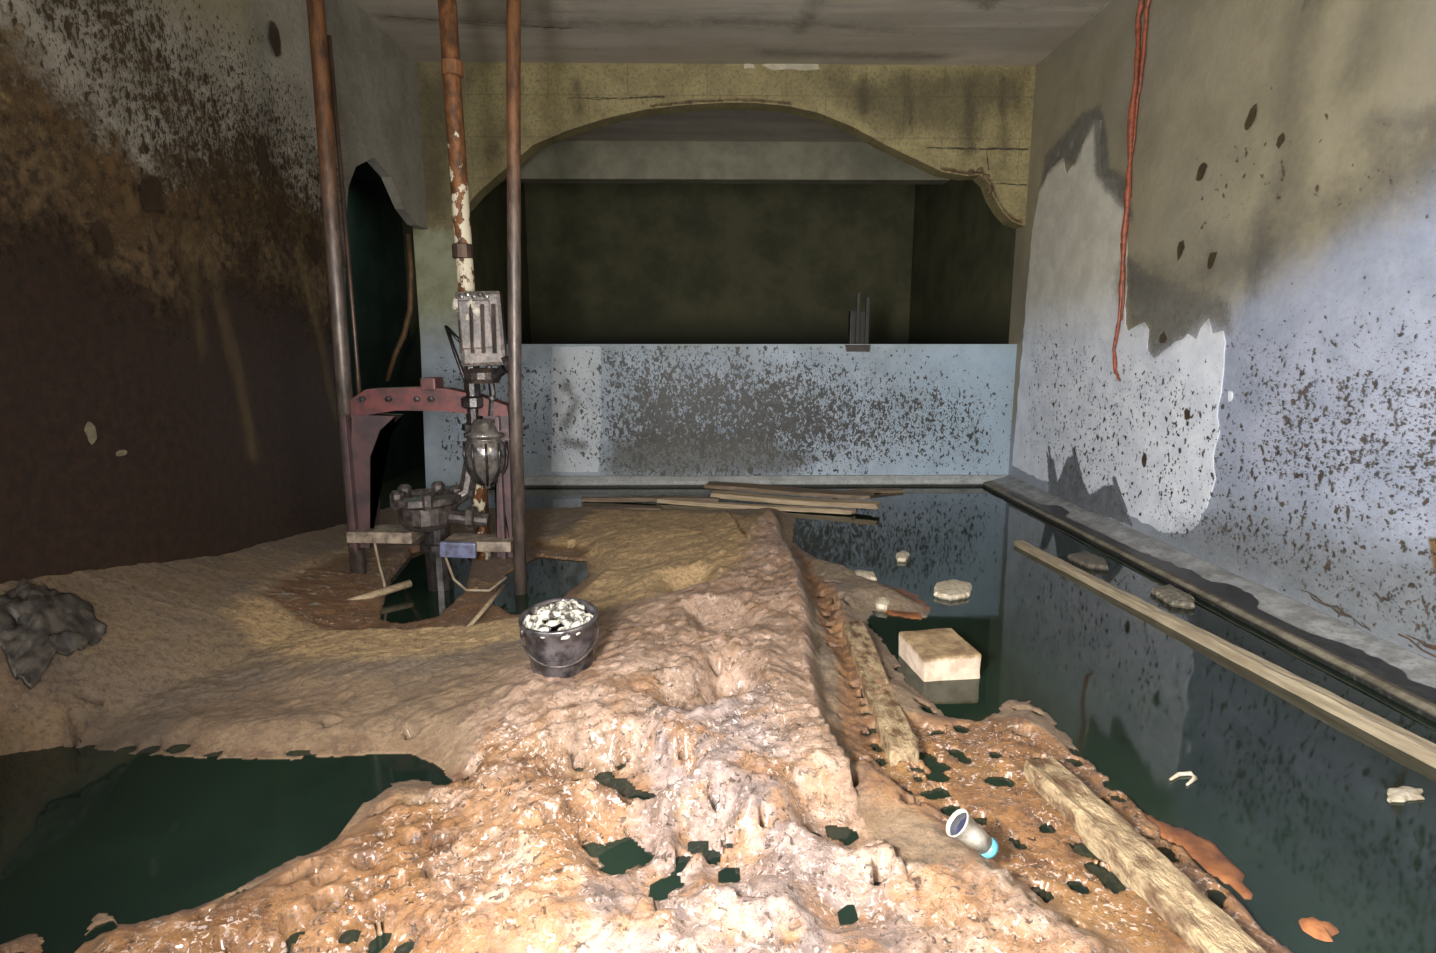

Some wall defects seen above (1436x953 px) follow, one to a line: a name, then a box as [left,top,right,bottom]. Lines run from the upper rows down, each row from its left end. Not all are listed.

peeling [1012,109,1233,534]